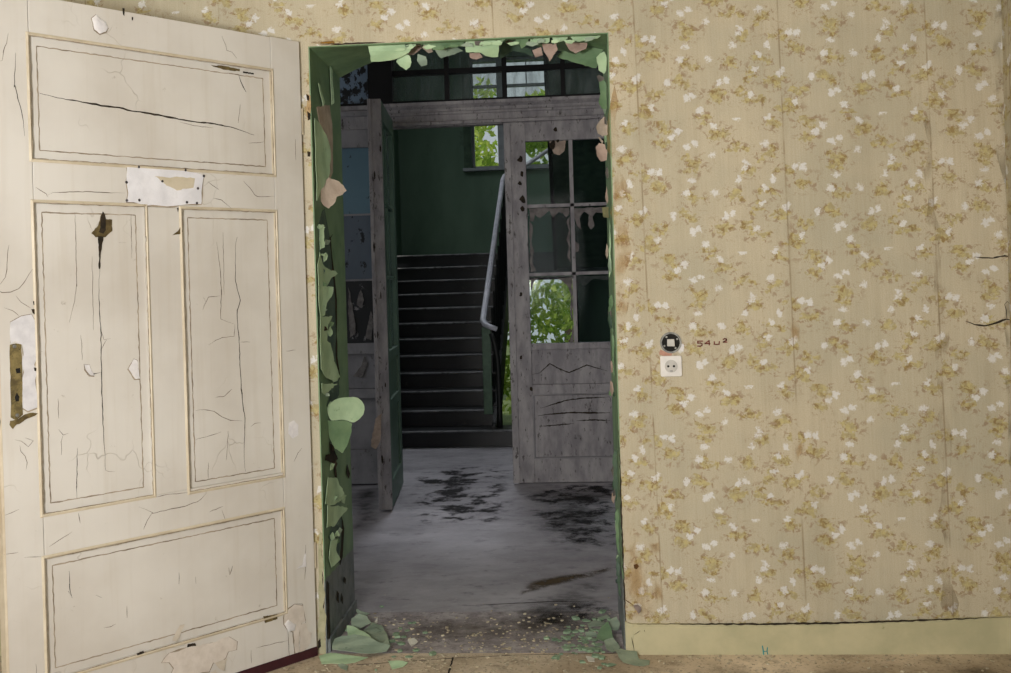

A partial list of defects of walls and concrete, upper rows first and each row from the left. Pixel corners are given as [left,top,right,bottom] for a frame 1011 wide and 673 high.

peeling [368,36,610,222]
peeling [263,66,378,654]
peeling [608,295,616,397]
damp [418,467,501,522]
damp [534,485,615,543]